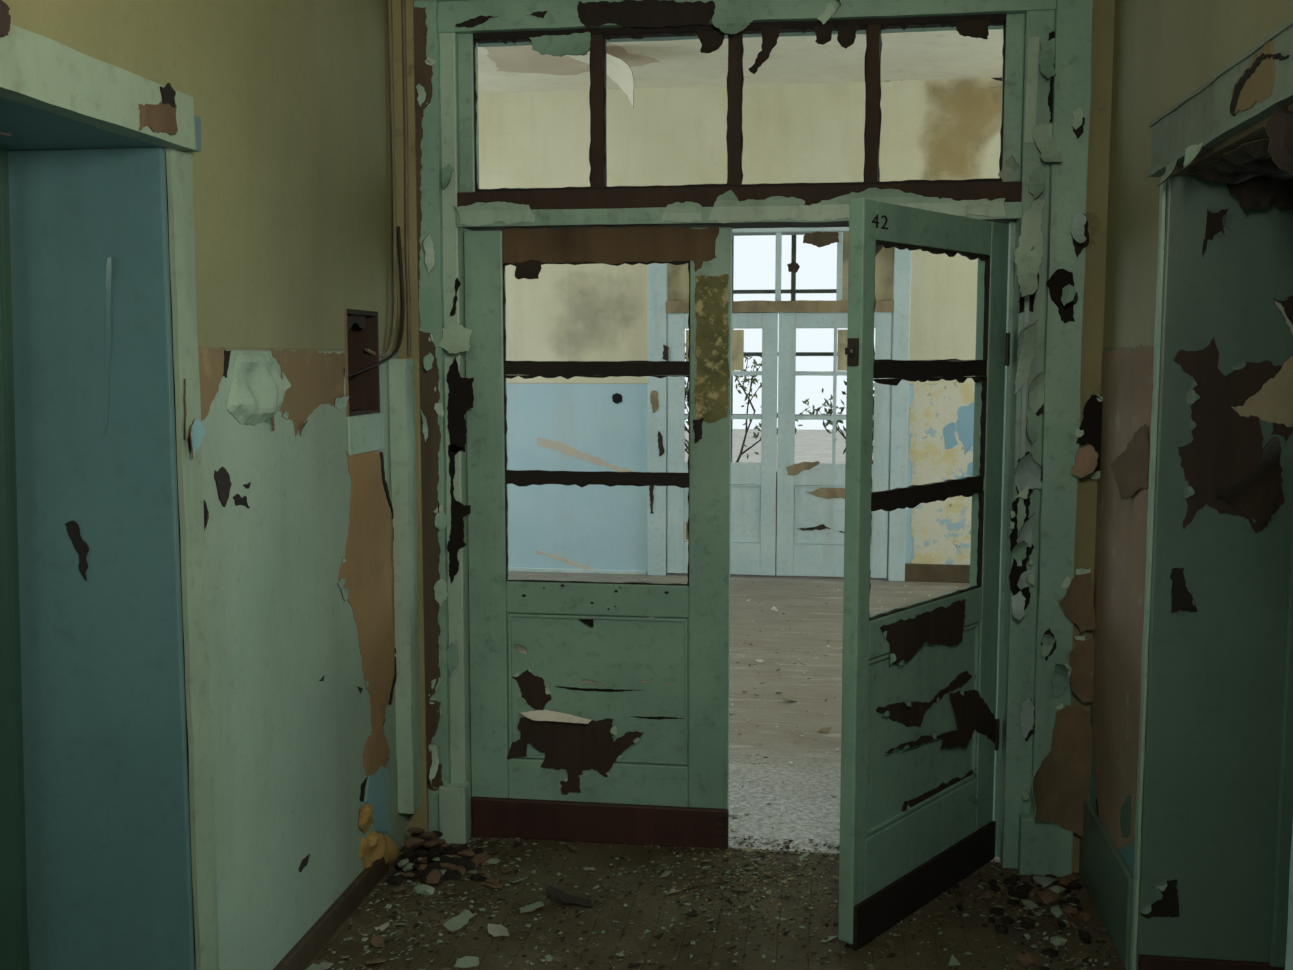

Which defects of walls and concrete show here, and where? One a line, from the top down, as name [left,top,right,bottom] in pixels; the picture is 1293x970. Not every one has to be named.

peeling [529,0,781,74]
peeling [813,0,859,49]
water stain [931,80,1002,177]
peeling [908,381,975,485]
peeling [1174,337,1293,533]
spalling [201,467,251,531]
flaking render [338,450,397,835]
peeling [419,322,473,794]
peeling [910,495,972,565]
flaking render [1032,345,1154,851]
peeling [507,644,643,795]
peeling [876,671,996,753]